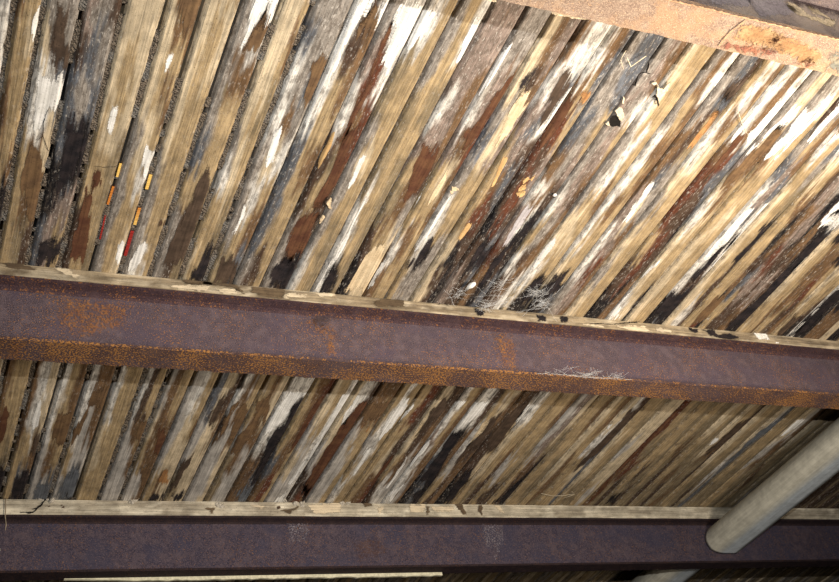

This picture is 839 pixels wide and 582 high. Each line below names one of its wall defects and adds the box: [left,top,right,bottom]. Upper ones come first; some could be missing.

corrosion [668,0,839,68]
corrosion [57,297,133,337]